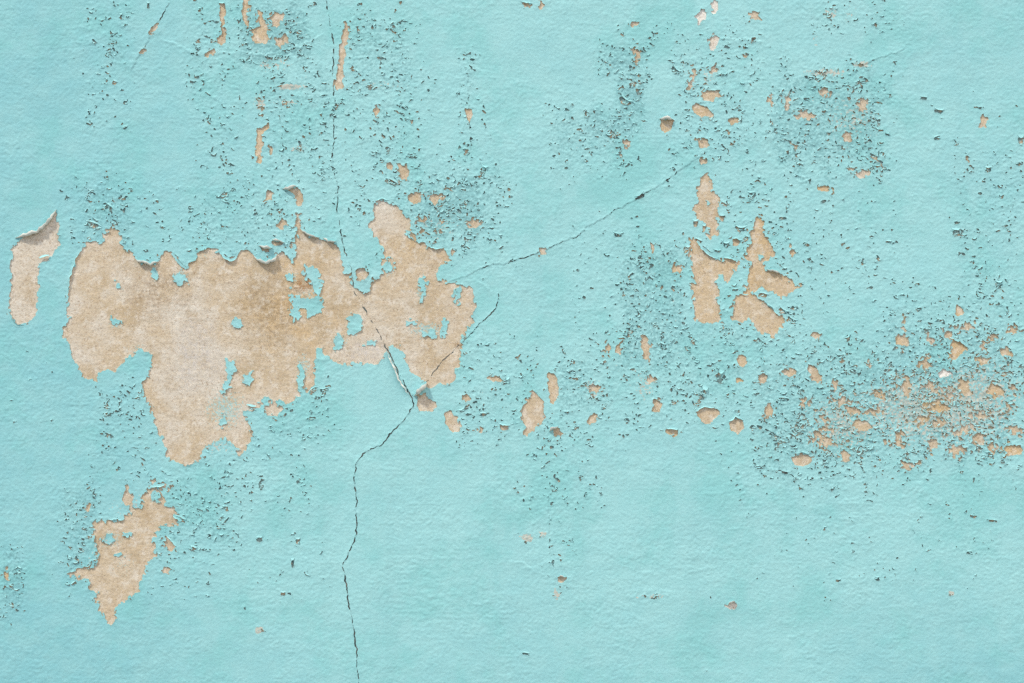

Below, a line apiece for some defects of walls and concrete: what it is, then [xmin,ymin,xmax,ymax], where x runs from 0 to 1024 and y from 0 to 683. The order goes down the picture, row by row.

peeling [191,0,413,203]
peeling [694,0,763,86]
peeling [7,208,61,328]
crack [285,1,499,683]
peeling [62,21,1024,509]
peeling [58,454,253,626]